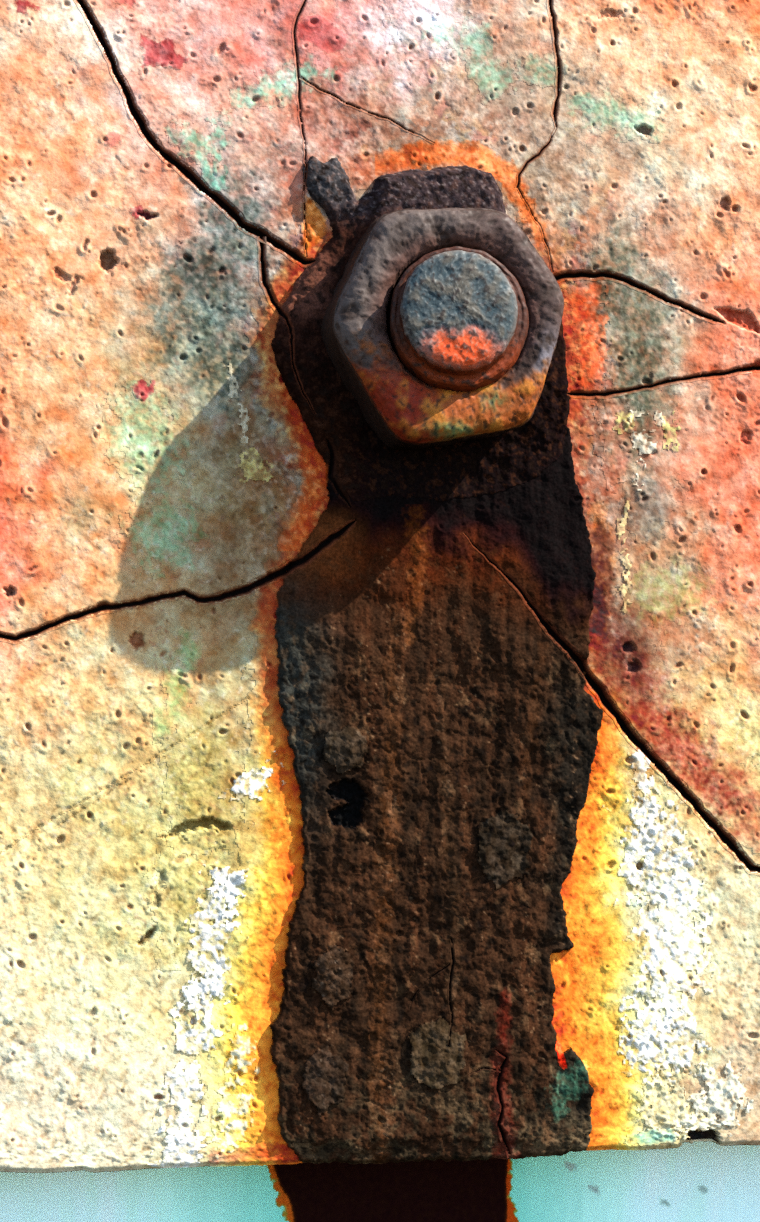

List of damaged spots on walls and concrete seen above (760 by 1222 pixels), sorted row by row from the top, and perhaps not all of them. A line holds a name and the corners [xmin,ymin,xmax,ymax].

crack [0,0,435,644]
water stain [93,13,414,1222]
corrosion [193,138,760,1222]
crack [463,532,760,876]
crack [515,0,725,325]
crack [566,363,760,399]
water stain [510,749,754,1222]